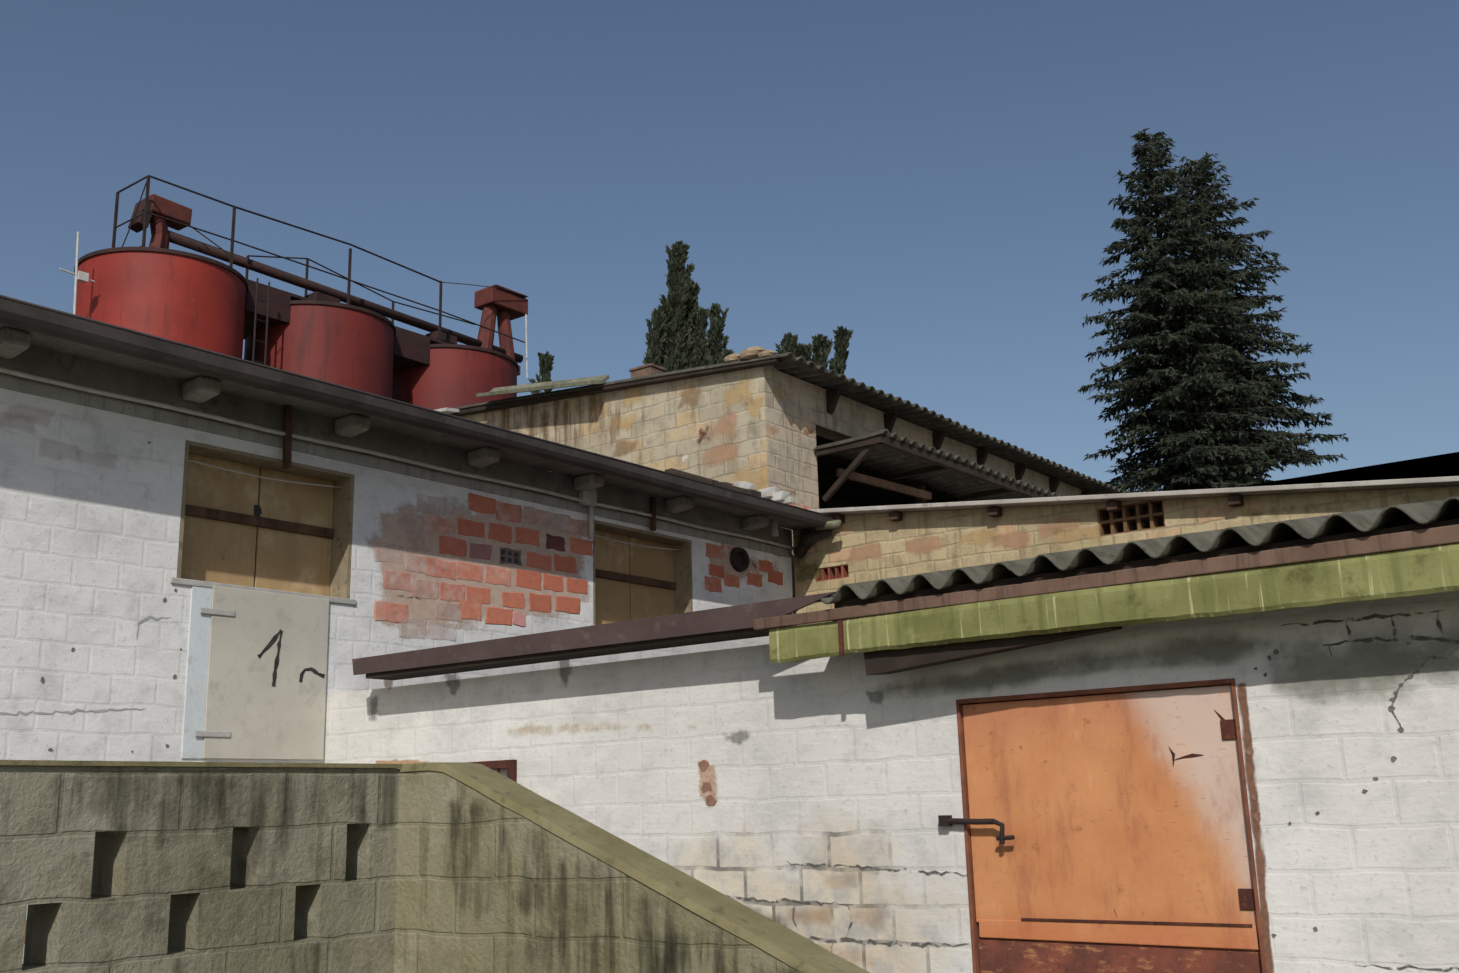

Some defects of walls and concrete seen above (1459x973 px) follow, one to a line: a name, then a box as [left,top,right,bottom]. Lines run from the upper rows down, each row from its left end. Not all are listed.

flaking render [372,493,593,642]
flaking render [704,543,783,593]
water stain [1295,643,1459,685]
crack [0,708,146,716]
crack [1281,610,1459,793]
spalling [698,760,717,806]
rust [1021,683,1273,973]